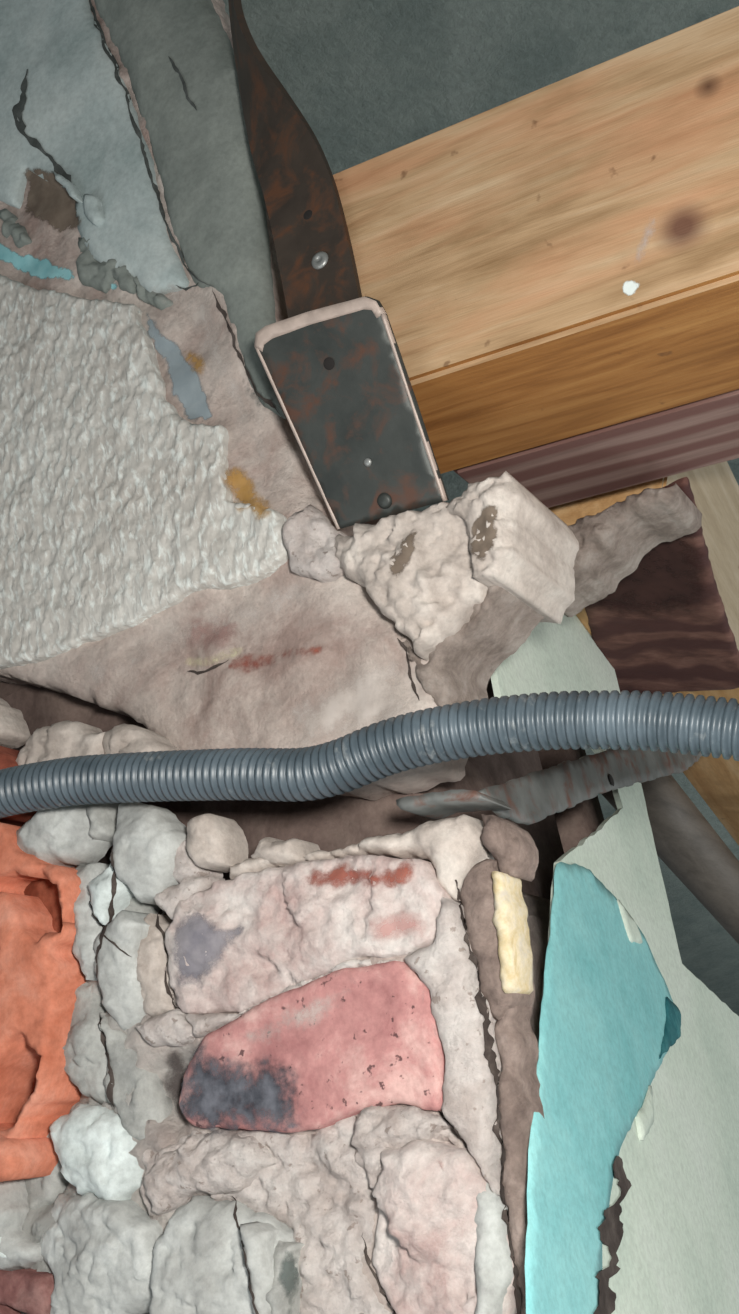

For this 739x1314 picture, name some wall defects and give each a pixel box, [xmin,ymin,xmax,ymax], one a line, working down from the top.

crack [12,69,78,204]
crack [89,0,282,417]
spalling [0,168,212,420]
crack [88,850,131,978]
crack [155,909,180,1009]
crack [439,1111,460,1137]
crack [455,880,521,1314]
peeling [525,862,681,1314]
crack [232,1196,259,1314]
crack [362,1233,396,1314]